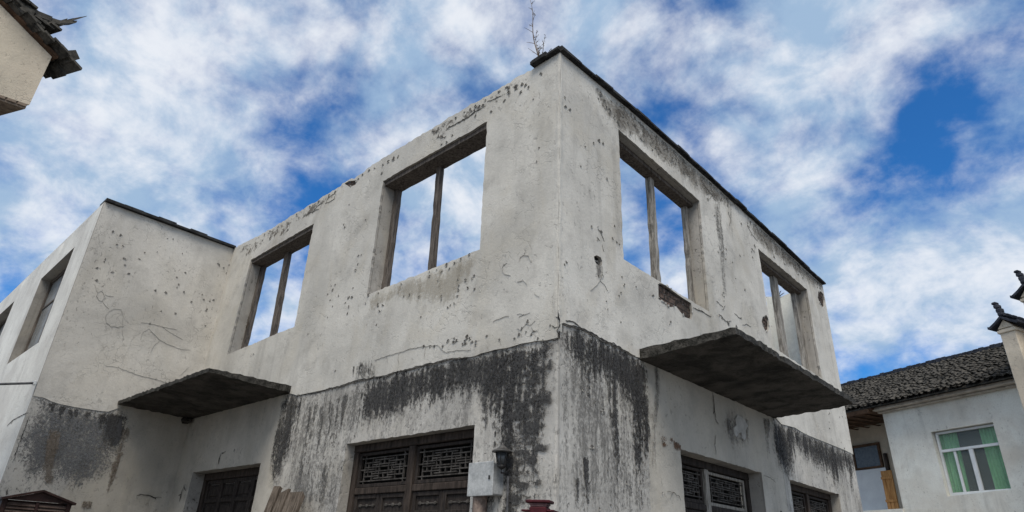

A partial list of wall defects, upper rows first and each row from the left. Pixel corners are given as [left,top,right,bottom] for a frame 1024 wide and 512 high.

crack [95,286,186,383]
crack [493,253,635,364]
flaking render [652,282,693,319]
leakage [19,398,129,490]
leakage [353,329,658,512]
leakage [764,418,855,492]